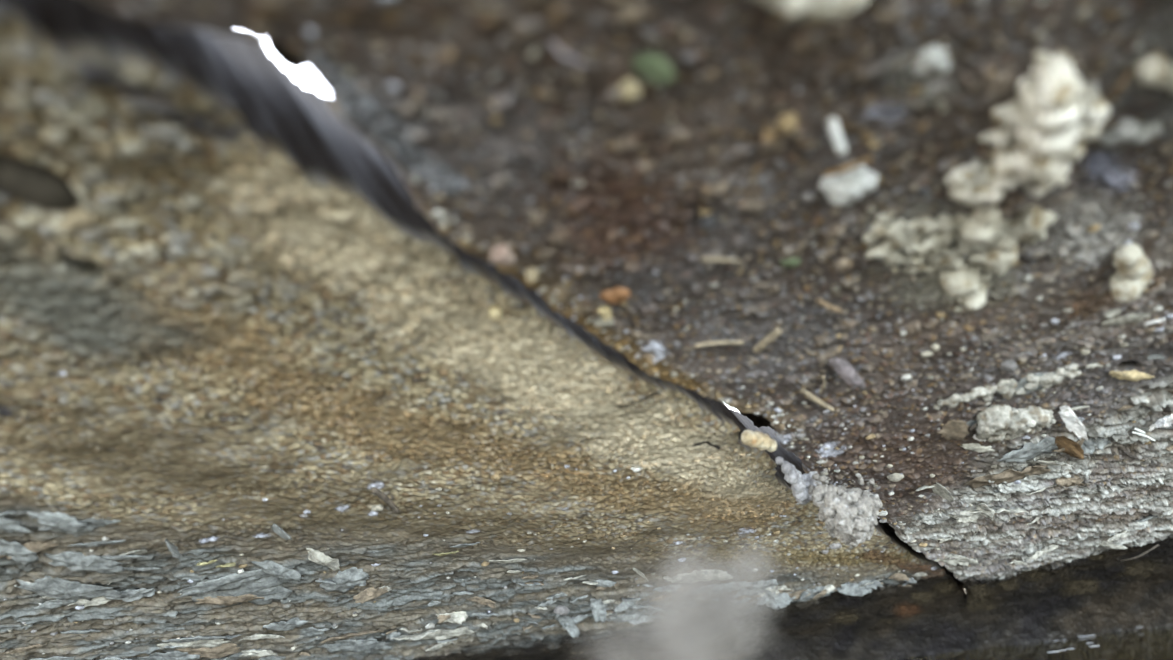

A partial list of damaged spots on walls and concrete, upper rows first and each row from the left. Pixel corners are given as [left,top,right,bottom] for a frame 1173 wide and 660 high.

crack [269,42,306,69]
efflorescence [1134,50,1173,94]
water stain [862,45,1163,312]
peeling [1101,309,1166,326]
peeling [1077,354,1165,382]
crack [740,412,775,430]
peeling [1149,414,1173,431]
crack [694,441,721,450]
peeling [939,405,1111,496]
peeling [916,482,1043,525]
crack [877,518,895,532]
crack [942,566,967,601]